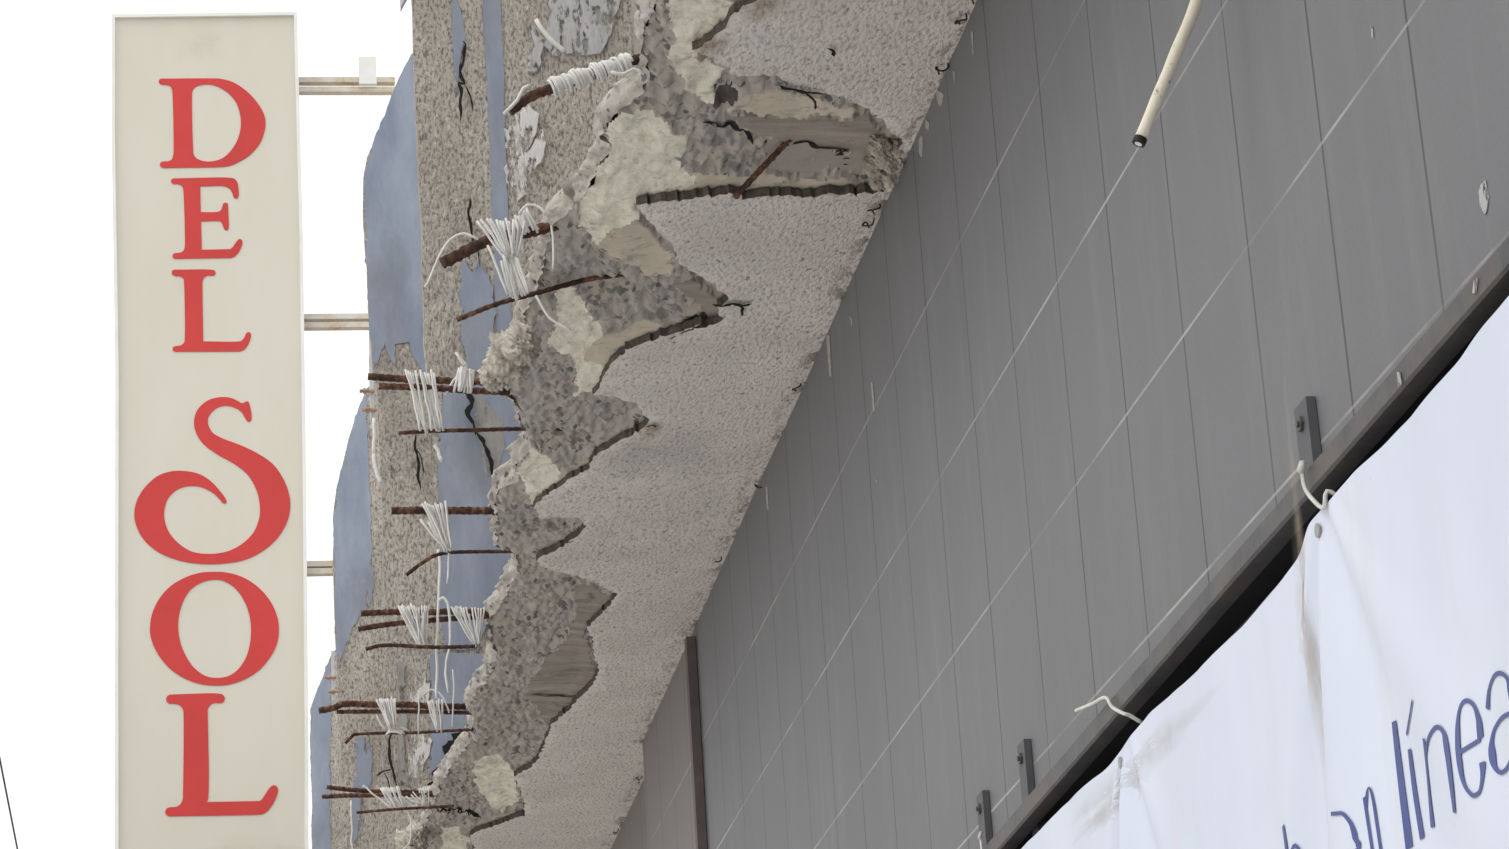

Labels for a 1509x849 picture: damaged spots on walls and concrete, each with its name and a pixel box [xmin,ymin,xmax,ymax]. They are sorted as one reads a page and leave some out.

crack [458,41,473,121]
spalling [318,0,904,849]